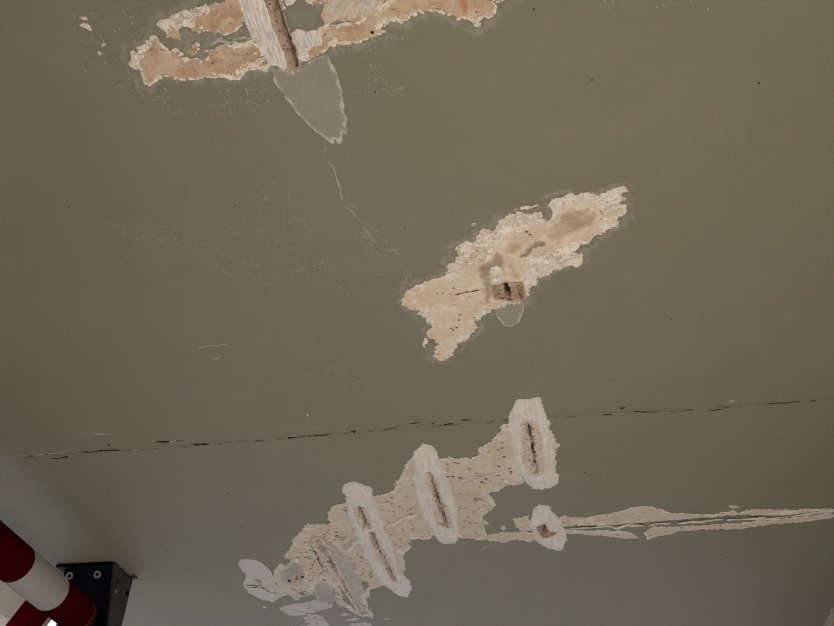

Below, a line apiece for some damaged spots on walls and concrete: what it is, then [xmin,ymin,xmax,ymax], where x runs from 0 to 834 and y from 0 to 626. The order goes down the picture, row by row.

flaking render [98,0,279,97]
flaking render [294,0,528,70]
flaking render [394,181,635,366]
crack [0,397,834,459]
flaking render [266,424,538,626]